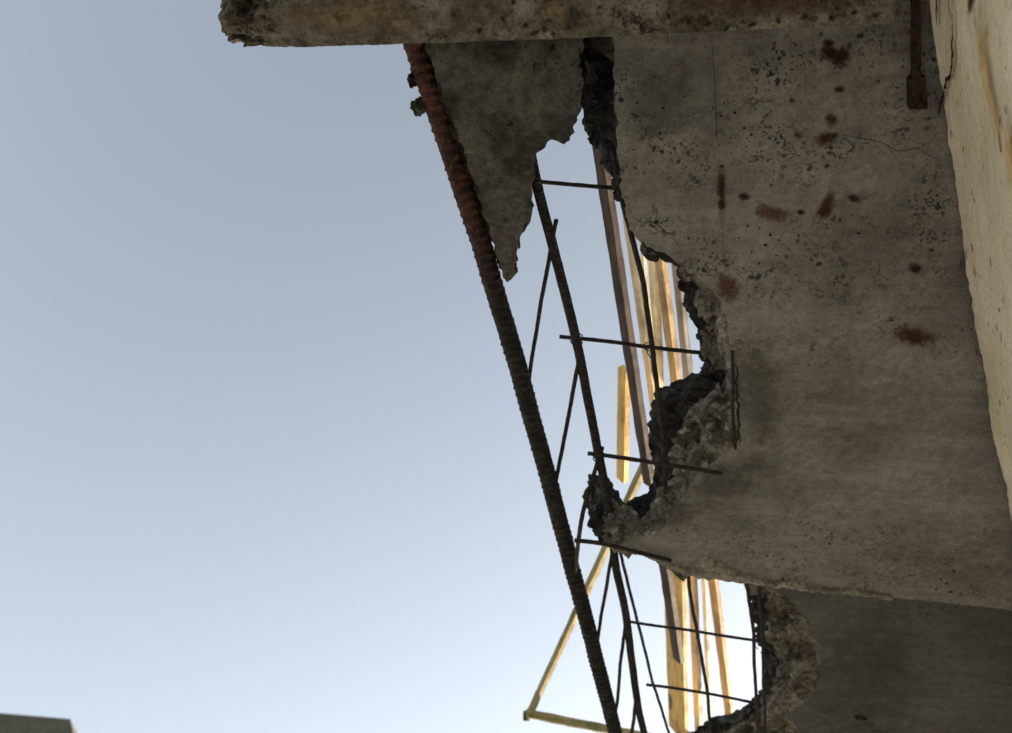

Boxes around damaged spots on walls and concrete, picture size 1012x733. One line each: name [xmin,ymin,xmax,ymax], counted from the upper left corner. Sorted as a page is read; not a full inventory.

rust [820,40,850,69]
crack [935,0,954,116]
rust [717,169,725,210]
rust [756,204,805,221]
rust [817,192,834,218]
rust [897,328,934,347]